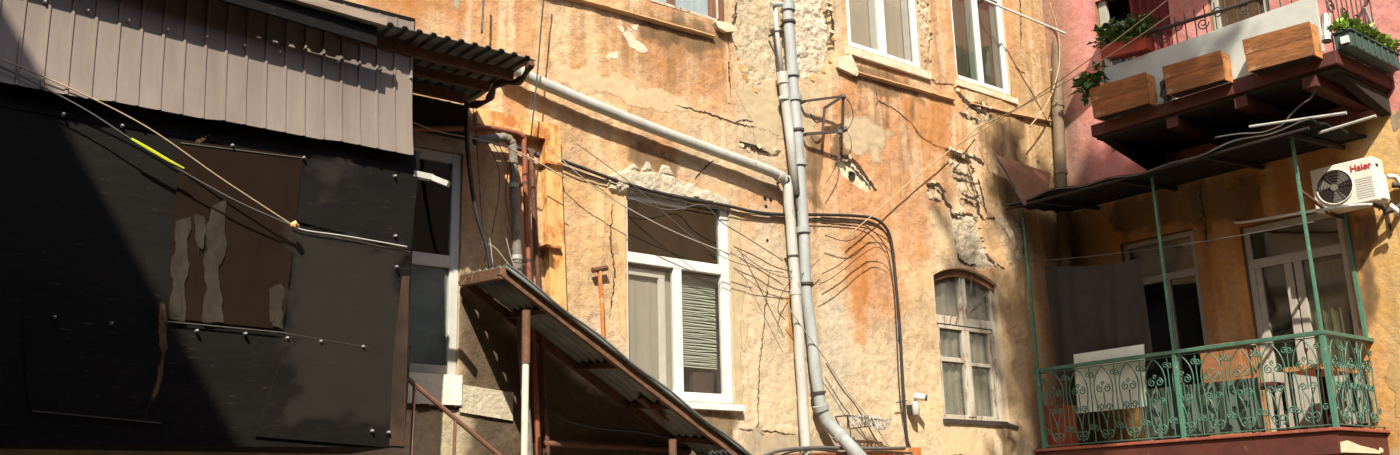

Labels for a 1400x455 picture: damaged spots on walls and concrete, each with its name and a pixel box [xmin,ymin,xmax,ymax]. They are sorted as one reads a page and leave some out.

spalling [731,0,835,157]
spalling [926,153,997,270]